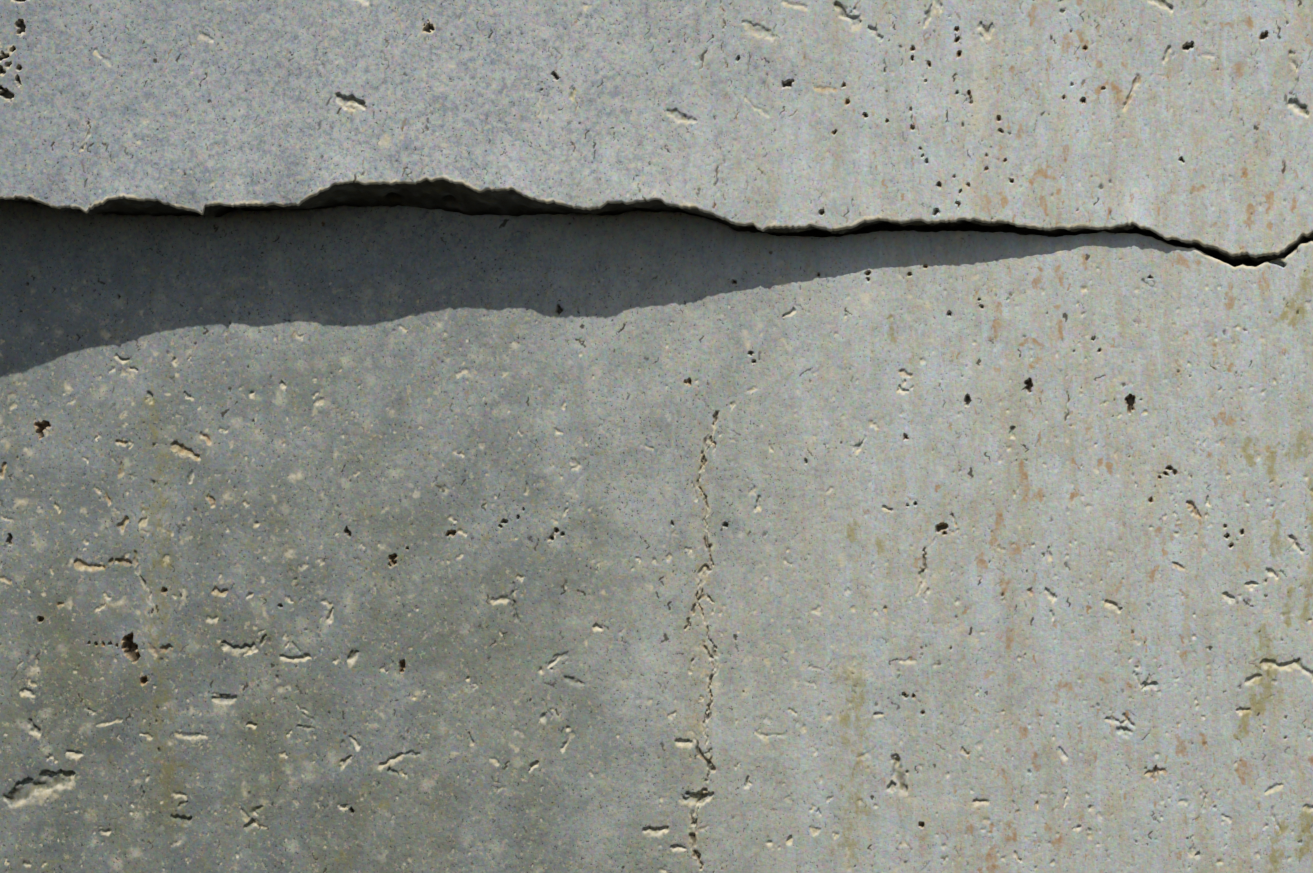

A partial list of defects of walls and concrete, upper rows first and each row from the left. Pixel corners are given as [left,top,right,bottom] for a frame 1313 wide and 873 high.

crack [0,0,1313,269]
crack [682,408,726,873]